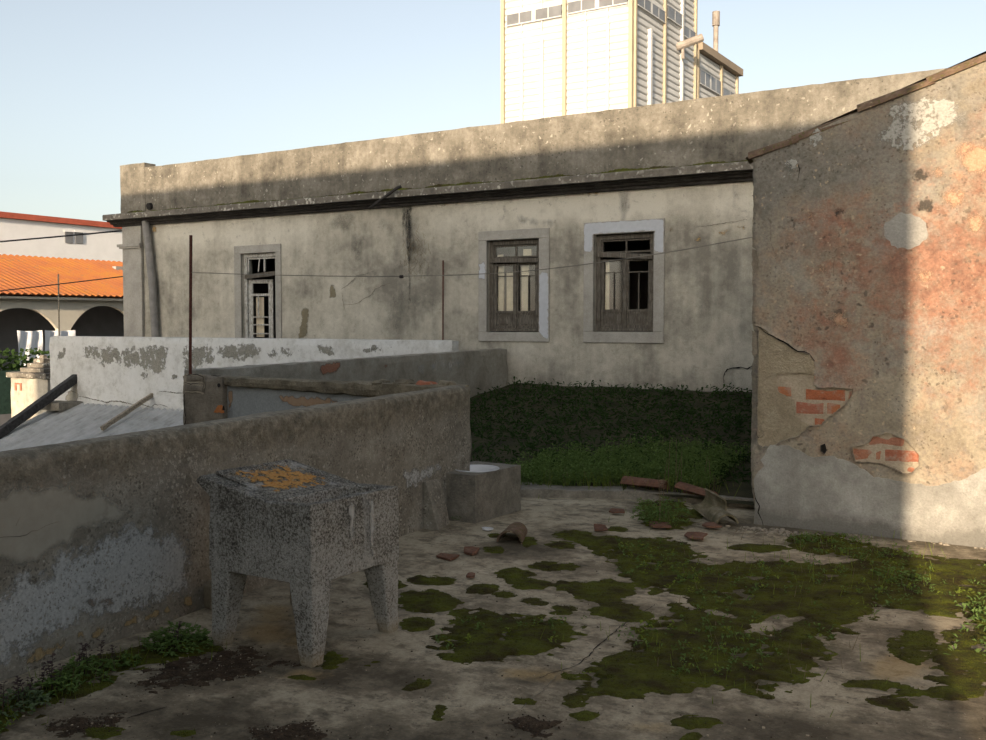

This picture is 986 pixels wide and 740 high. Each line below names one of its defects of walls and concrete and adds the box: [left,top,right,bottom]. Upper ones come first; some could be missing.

crack [342,209,411,309]
water stain [403,207,414,261]
peeling [85,344,291,394]
spalling [752,328,853,447]
flaking render [853,433,920,473]
crack [511,604,655,717]